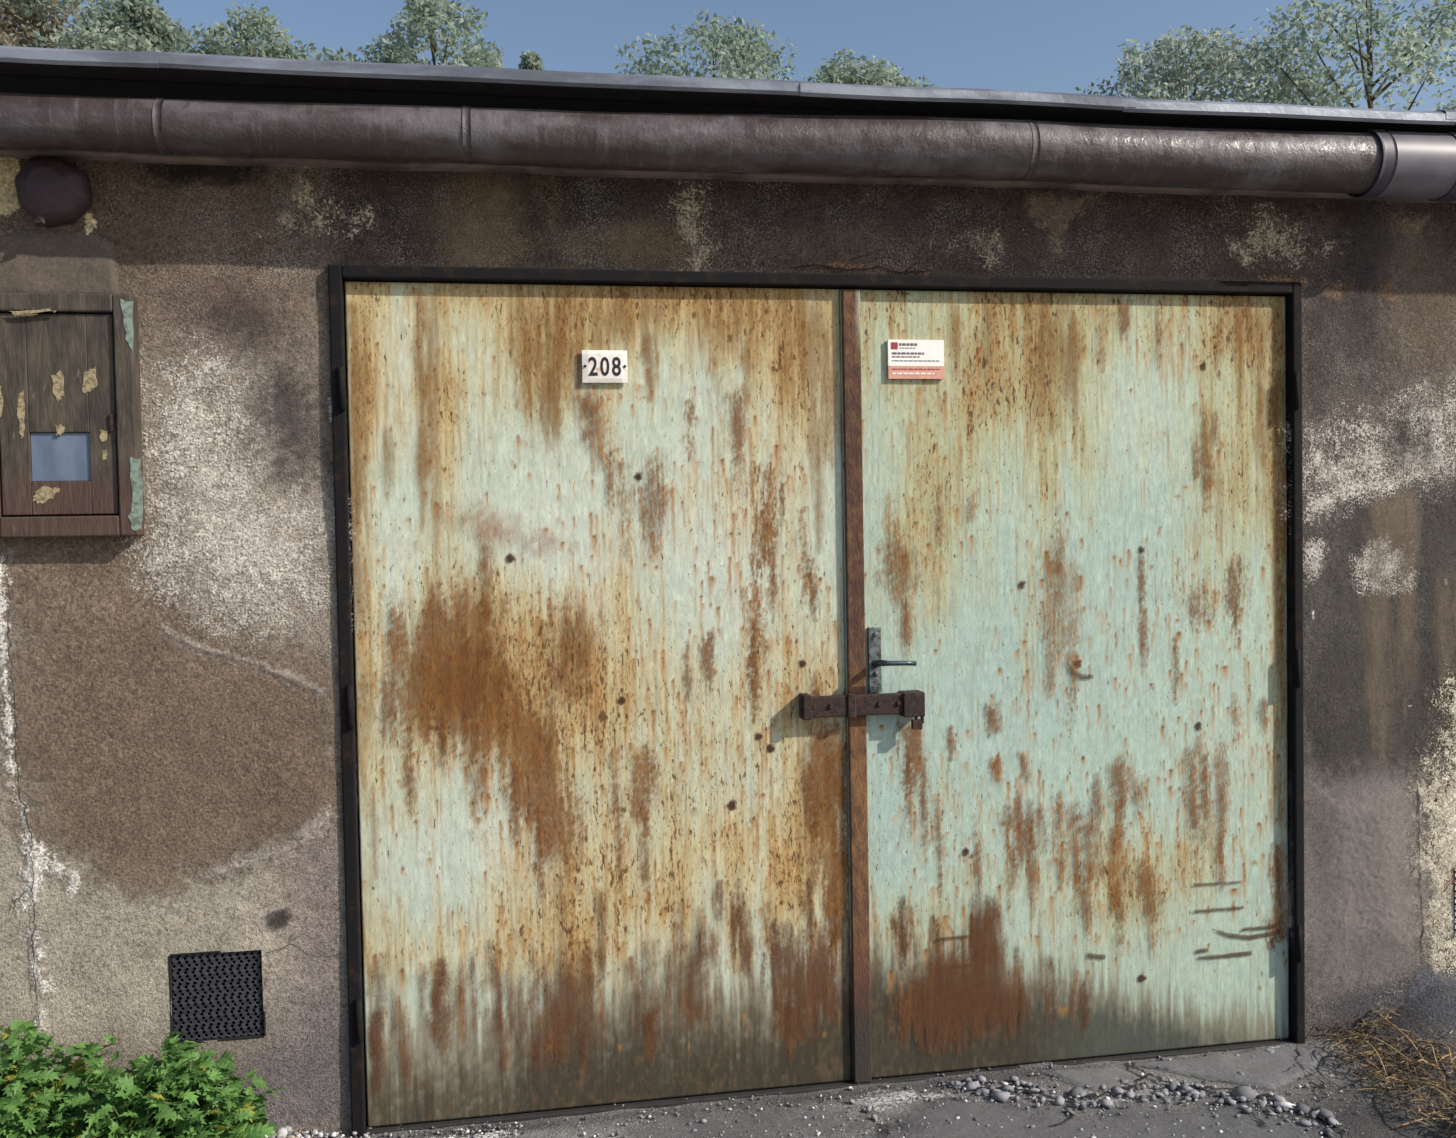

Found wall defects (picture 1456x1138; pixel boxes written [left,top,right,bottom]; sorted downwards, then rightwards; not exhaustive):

water stain [0,325,359,899]
corrosion [519,295,668,557]
corrosion [722,384,823,753]
corrosion [1137,547,1149,667]
water stain [1274,371,1456,786]
crack [7,570,43,1027]
corrosion [369,535,606,1090]
corrosion [609,746,662,904]
corrosion [631,717,852,1057]
corrosion [896,723,943,896]
corrosion [888,752,1166,1053]
corrosion [1183,693,1285,888]